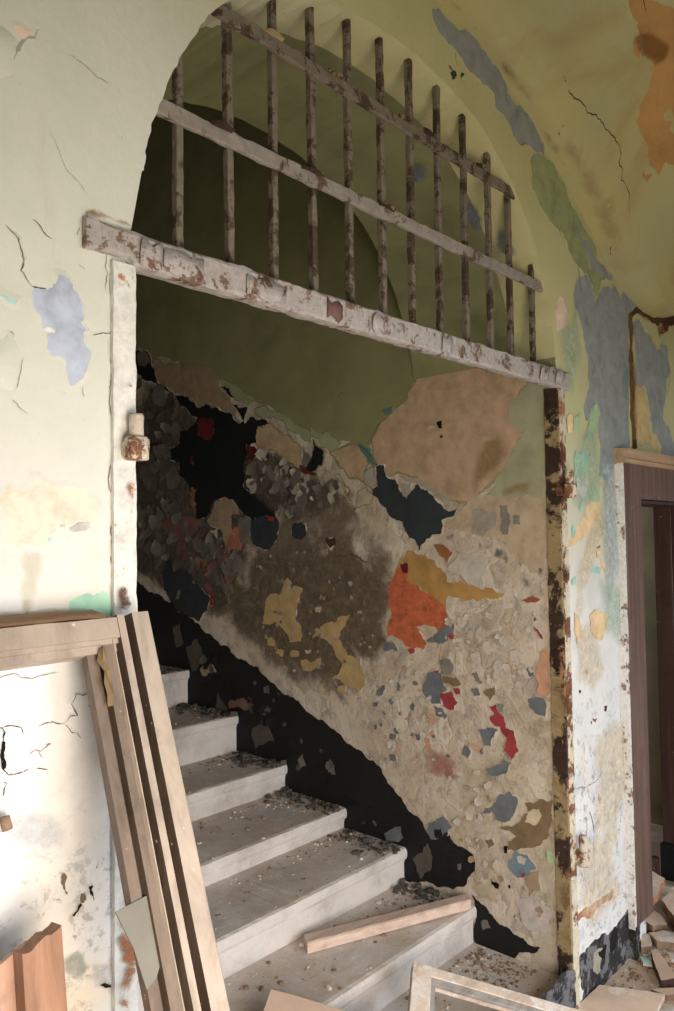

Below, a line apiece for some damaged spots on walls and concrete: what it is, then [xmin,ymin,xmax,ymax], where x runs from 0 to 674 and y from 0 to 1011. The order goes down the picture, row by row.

crack [563,75,630,213]
crack [6,219,53,289]
peeling [27,268,93,390]
peeling [430,0,674,550]
rust [628,307,674,449]
peeling [0,470,104,552]
damp [135,386,389,698]
peeling [135,348,556,958]
rust [560,646,569,716]
peeling [574,609,609,644]
crack [0,692,90,796]